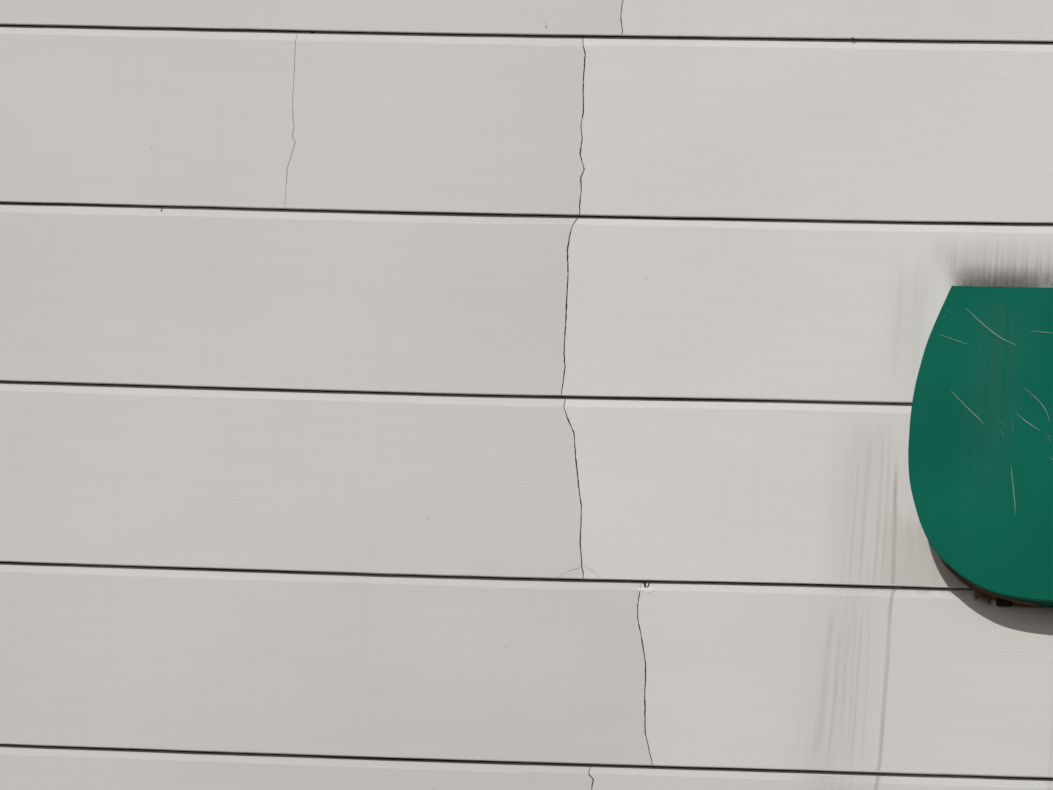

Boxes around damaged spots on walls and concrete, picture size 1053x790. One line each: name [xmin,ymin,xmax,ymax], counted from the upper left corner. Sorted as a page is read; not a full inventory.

crack [285,36,297,199]
crack [559,41,599,582]
crack [637,592,655,769]